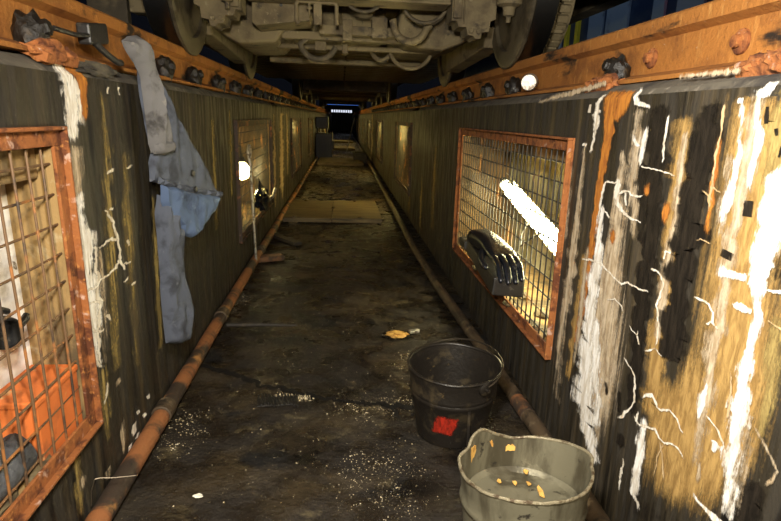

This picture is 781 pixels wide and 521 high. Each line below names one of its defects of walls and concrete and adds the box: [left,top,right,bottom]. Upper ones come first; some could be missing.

damp [52,64,137,438]
crack [87,210,131,367]
corrosion [574,90,636,343]
crack [598,179,641,223]
crack [582,250,671,356]
corrosion [662,202,670,222]
damp [556,82,781,521]
crack [695,297,718,329]
damp [120,410,147,453]
crack [619,358,683,478]
crack [707,373,732,448]
damp [74,458,85,514]